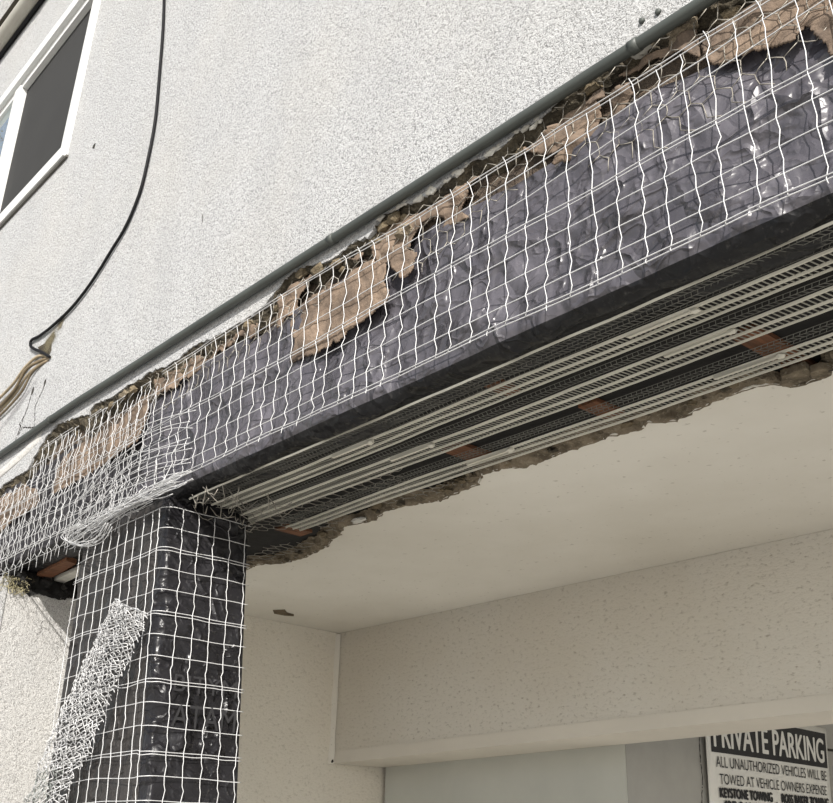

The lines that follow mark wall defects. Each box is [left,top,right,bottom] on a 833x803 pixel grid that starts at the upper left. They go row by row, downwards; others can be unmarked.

spalling [695,0,755,35]
spalling [0,31,671,498]
spalling [246,345,833,570]